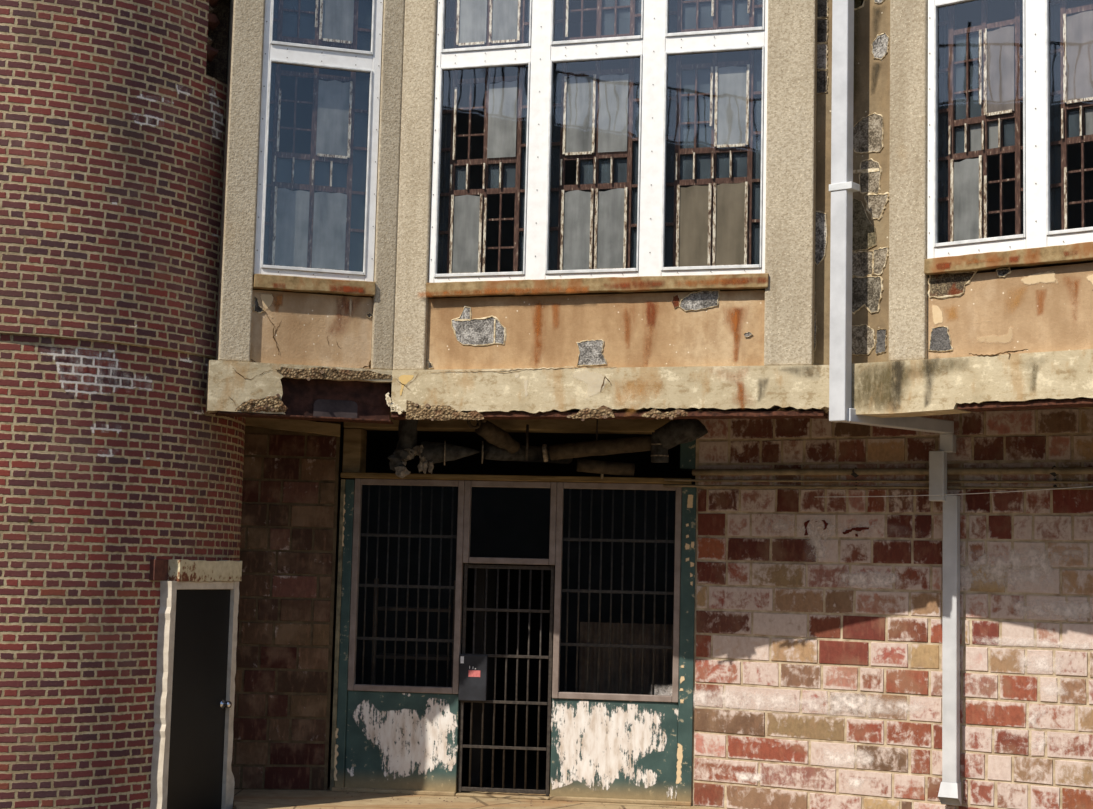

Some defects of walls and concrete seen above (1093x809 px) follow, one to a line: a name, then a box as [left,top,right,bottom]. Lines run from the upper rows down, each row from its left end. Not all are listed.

spalling [817,0,829,94]
spalling [815,211,828,266]
spalling [852,113,889,356]
spalling [451,306,506,347]
spalling [672,290,720,312]
corrosion [730,310,740,360]
spalling [927,271,977,352]
spalling [235,394,288,412]
spalling [275,367,484,421]
water stain [853,361,907,405]
peeling [353,693,458,779]
peeling [551,701,683,799]